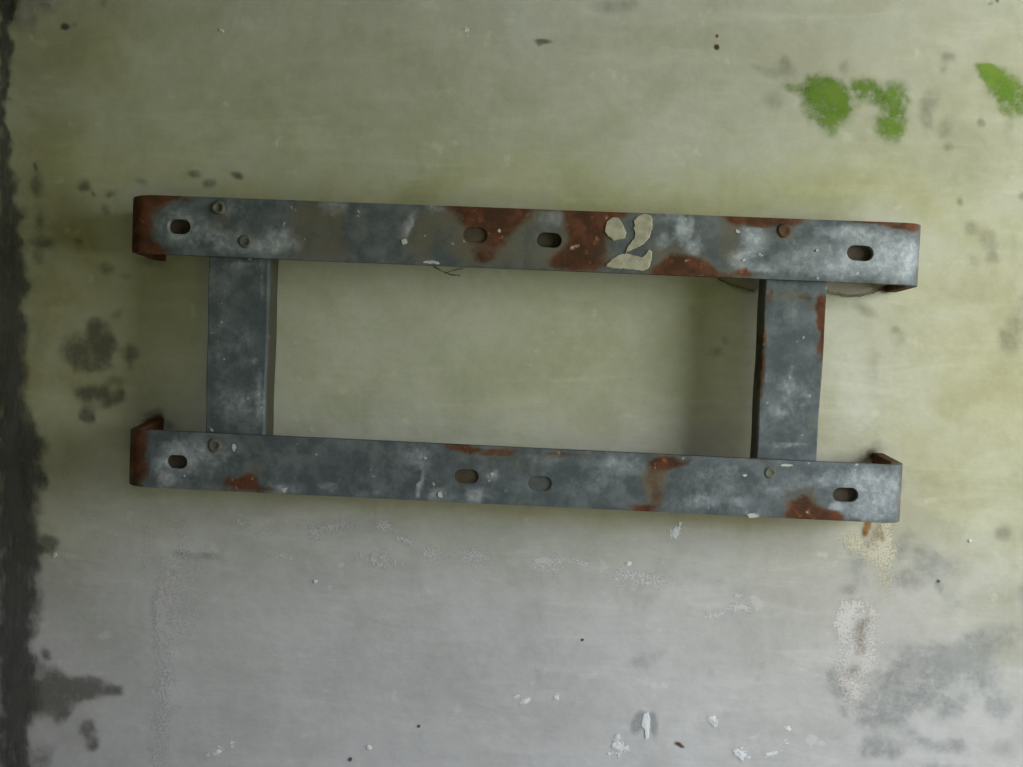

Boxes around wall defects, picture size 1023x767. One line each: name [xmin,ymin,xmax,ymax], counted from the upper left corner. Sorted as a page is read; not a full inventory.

water stain [0,0,123,767]
water stain [832,523,901,721]
flaking render [633,712,657,739]